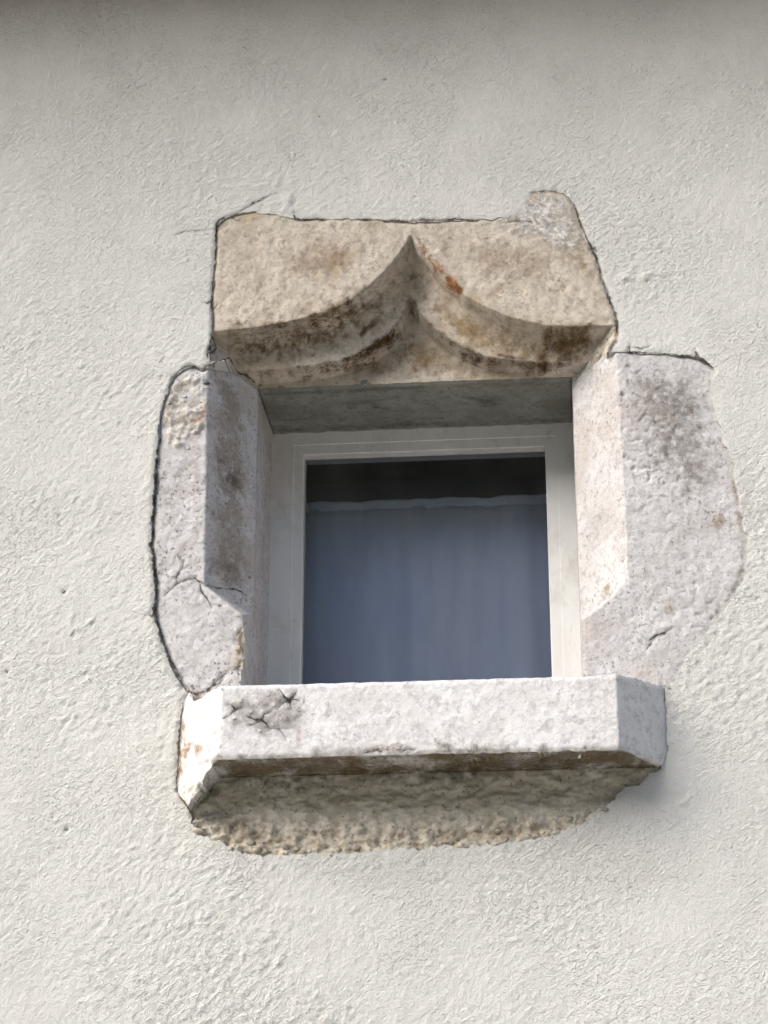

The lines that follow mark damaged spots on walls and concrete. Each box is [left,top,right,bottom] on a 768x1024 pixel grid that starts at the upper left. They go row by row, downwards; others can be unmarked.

crack [359,216,477,224]
corrosion [422,249,462,294]
crack [532,190,713,368]
leakage [231,300,379,356]
leakage [486,330,588,361]
crack [148,193,300,819]
flaking render [191,766,661,857]